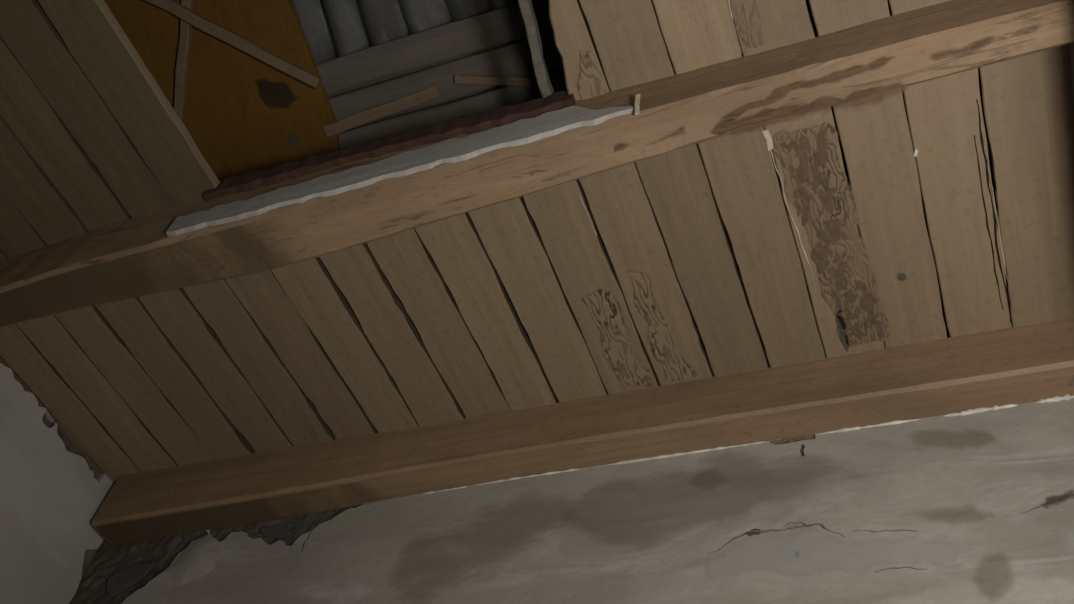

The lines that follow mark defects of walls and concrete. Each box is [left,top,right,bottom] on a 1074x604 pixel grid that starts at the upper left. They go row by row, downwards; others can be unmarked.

flaking render [38,403,101,479]
flaking render [69,504,362,604]
crack [706,522,915,555]
crack [876,565,927,573]